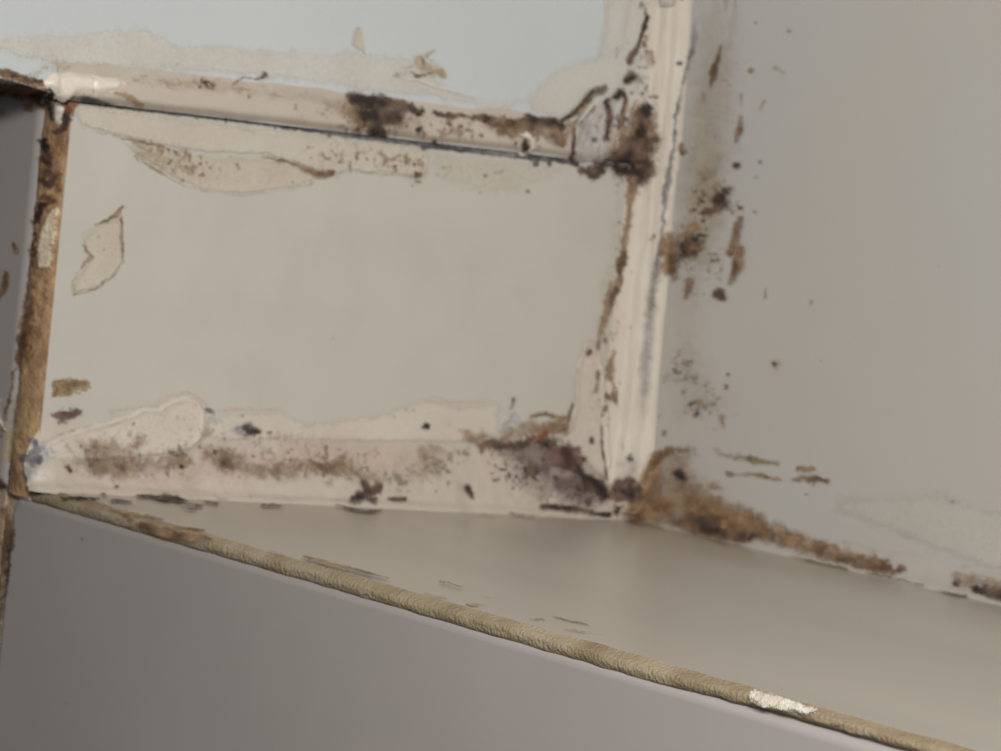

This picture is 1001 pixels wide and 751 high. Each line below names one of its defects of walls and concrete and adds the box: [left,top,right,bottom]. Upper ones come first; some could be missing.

peeling [390,48,475,97]
leakage [122,138,429,193]
peeling [73,205,122,294]
leakage [341,3,659,416]
leakage [647,0,753,426]
leakage [0,279,57,482]
leakage [52,378,90,397]
leakage [42,390,453,542]
leakage [478,435,643,517]
leakage [795,466,830,484]
leakage [796,540,923,586]
leakage [941,577,1001,601]